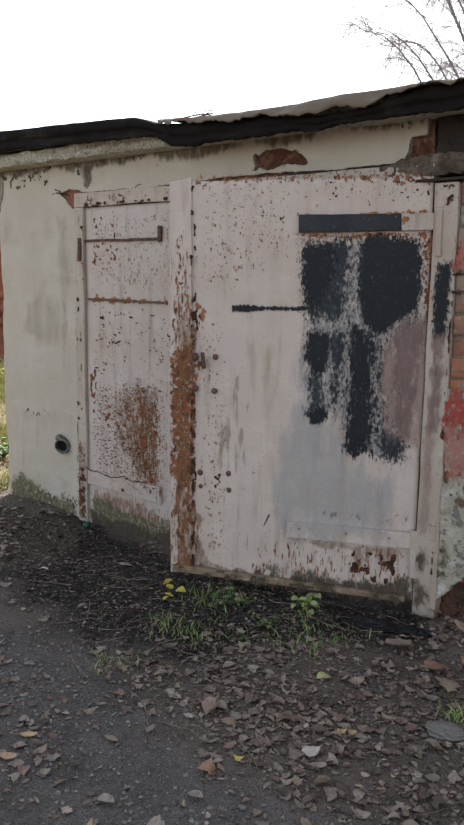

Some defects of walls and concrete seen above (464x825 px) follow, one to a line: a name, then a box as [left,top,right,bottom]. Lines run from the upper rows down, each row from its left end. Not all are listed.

spalling [411,134,435,157]
spalling [252,147,308,174]
spalling [60,188,83,208]
corrosion [75,169,435,566]
spalling [428,540,464,617]